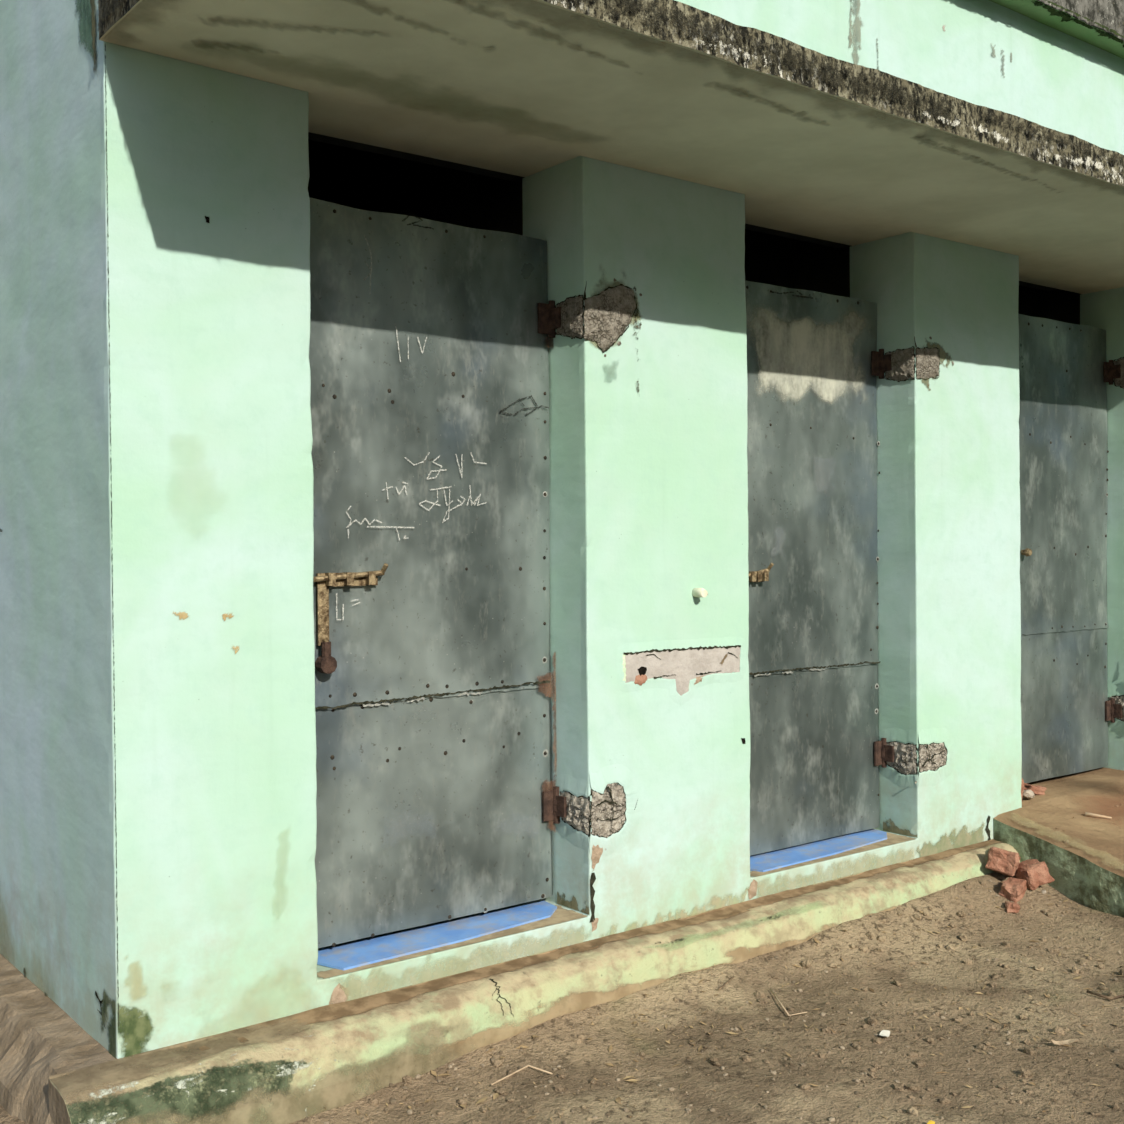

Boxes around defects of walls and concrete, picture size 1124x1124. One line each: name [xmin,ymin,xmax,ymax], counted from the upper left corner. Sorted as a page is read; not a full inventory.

water stain [90,0,123,71]
spalling [555,278,642,361]
spalling [884,336,954,391]
flaking render [616,637,747,706]
spalling [1108,684,1124,733]
spalling [879,727,955,789]
spalling [552,764,640,932]
crack [490,979,514,1016]